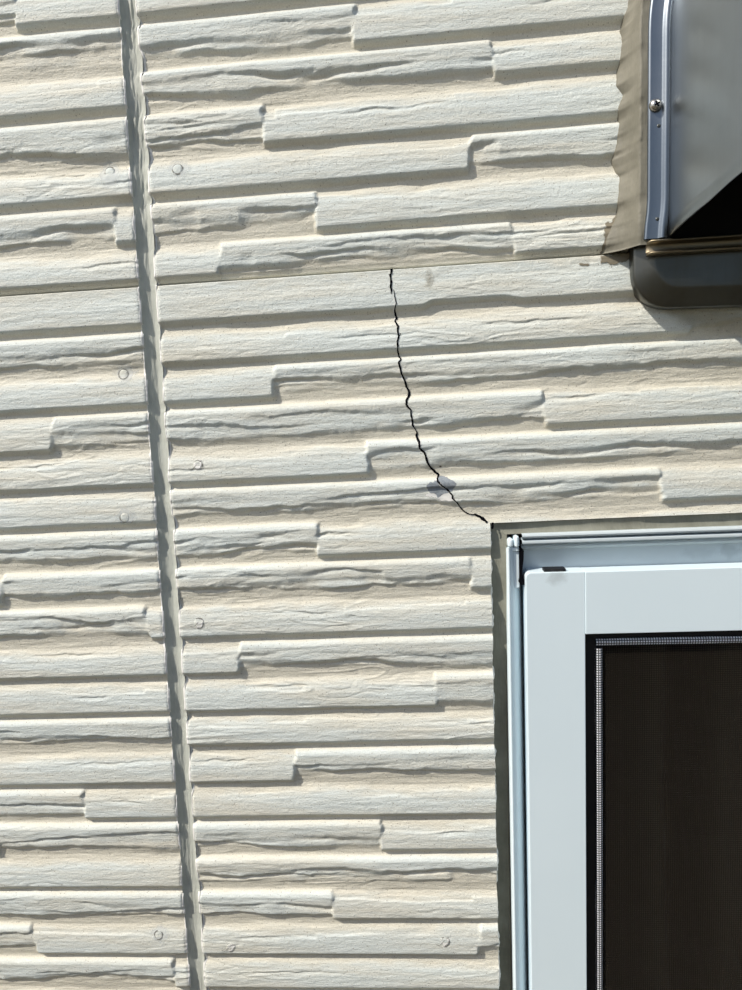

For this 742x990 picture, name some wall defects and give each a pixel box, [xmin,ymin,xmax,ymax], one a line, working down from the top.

crack [389,269,494,529]